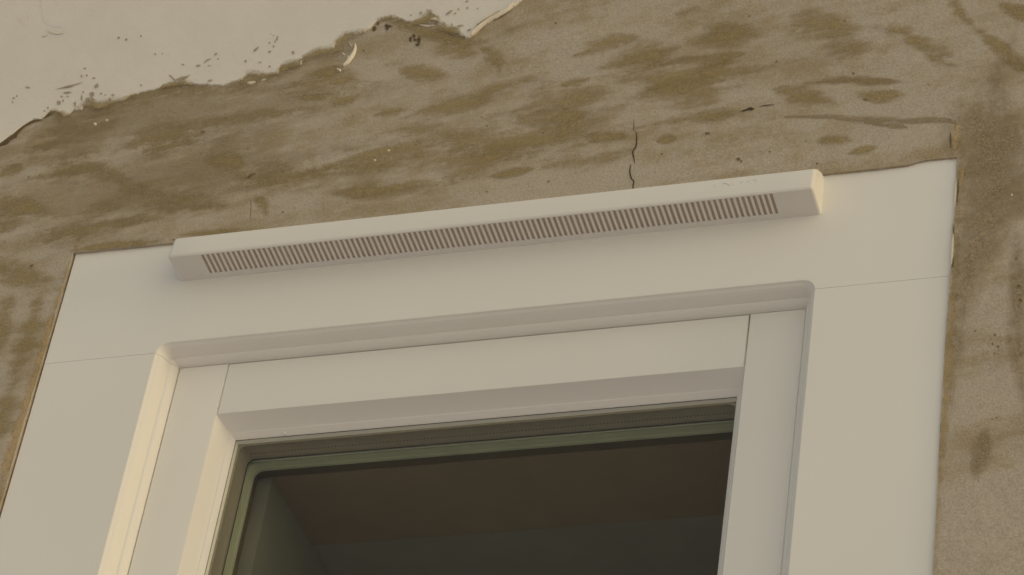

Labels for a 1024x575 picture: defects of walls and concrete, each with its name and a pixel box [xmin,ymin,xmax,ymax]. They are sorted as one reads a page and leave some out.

peeling [458,2,514,38]
spalling [0,111,62,146]
damp [37,85,210,149]
damp [130,65,355,152]
peeling [337,43,357,72]
damp [238,21,631,213]
crack [629,123,637,189]
damp [578,24,759,123]
damp [779,77,900,103]
damp [47,162,224,250]